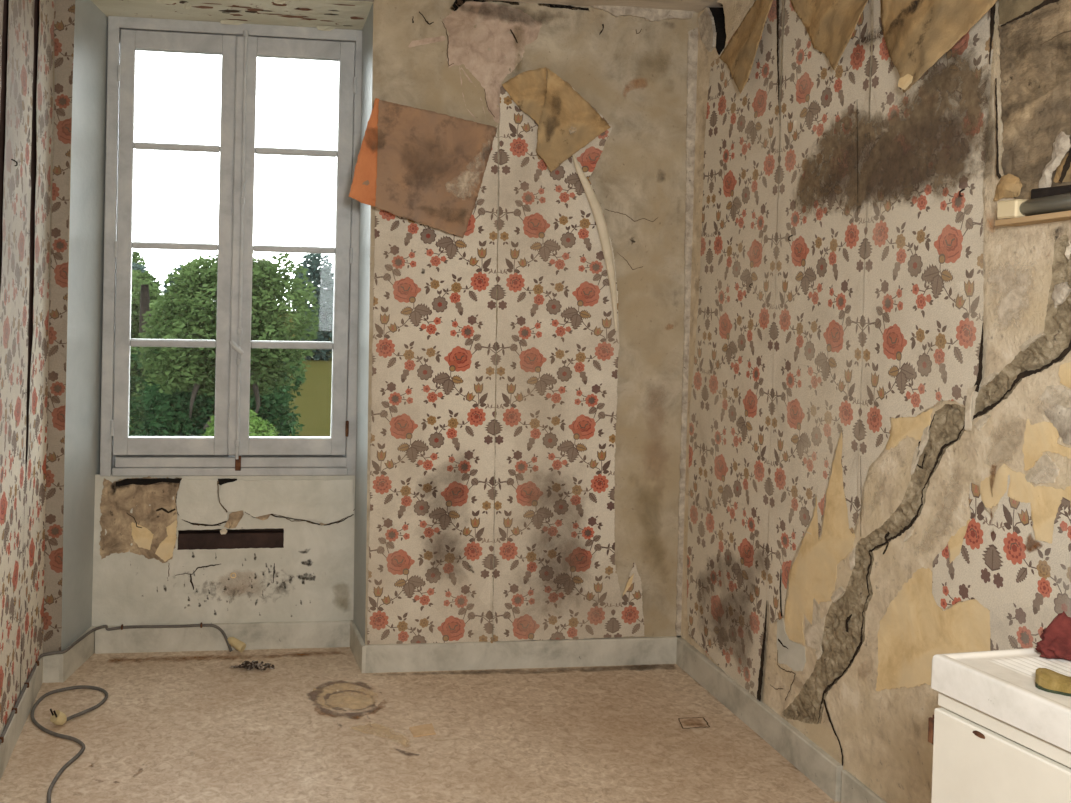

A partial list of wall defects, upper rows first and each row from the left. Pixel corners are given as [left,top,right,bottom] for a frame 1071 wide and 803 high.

flaking render [408,0,542,123]
water stain [795,50,993,212]
flaking render [998,0,1071,199]
peeling [964,385,977,431]
spalling [99,476,353,563]
crack [175,481,355,526]
crack [757,235,1071,766]
crack [168,564,220,590]
peeling [776,598,826,671]